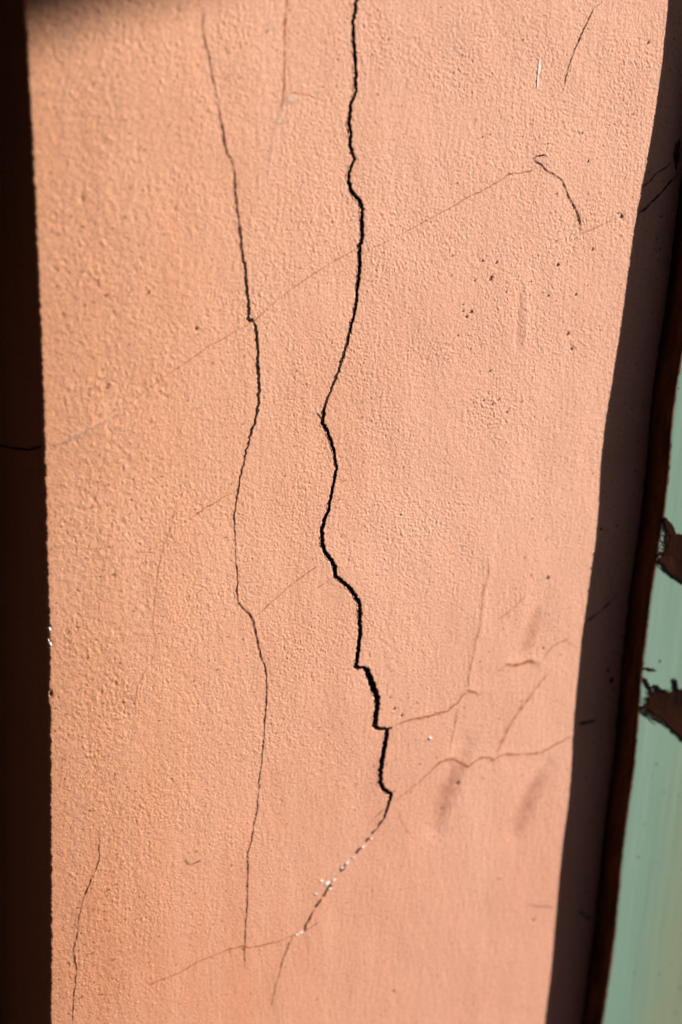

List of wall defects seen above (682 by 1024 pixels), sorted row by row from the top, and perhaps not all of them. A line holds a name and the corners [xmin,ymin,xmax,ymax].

crack [72,837,100,1024]
crack [152,0,610,984]